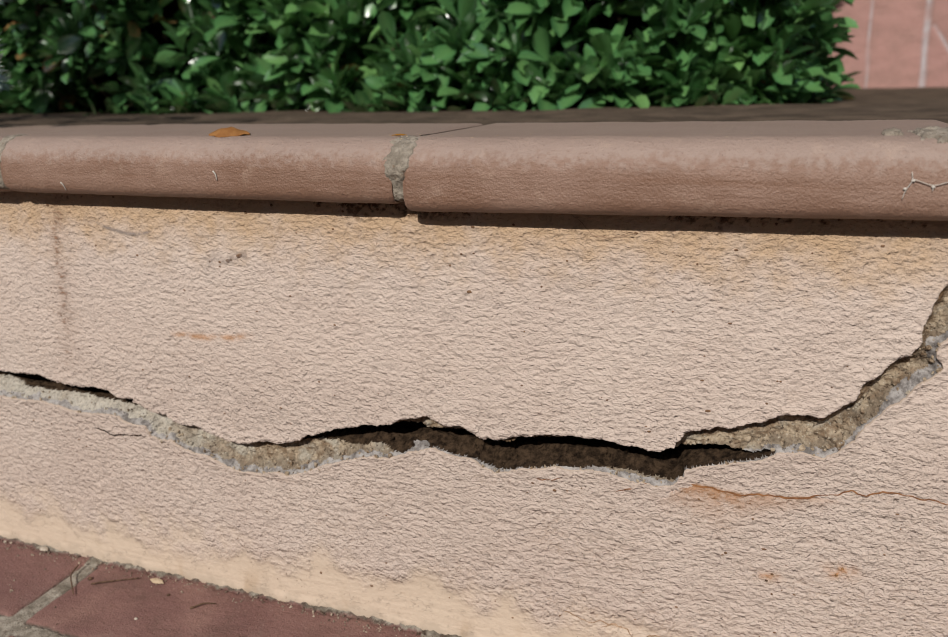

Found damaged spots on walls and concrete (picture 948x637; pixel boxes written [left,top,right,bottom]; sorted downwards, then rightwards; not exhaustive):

crack [0,371,147,437]
spalling [675,286,948,458]
crack [303,421,948,505]